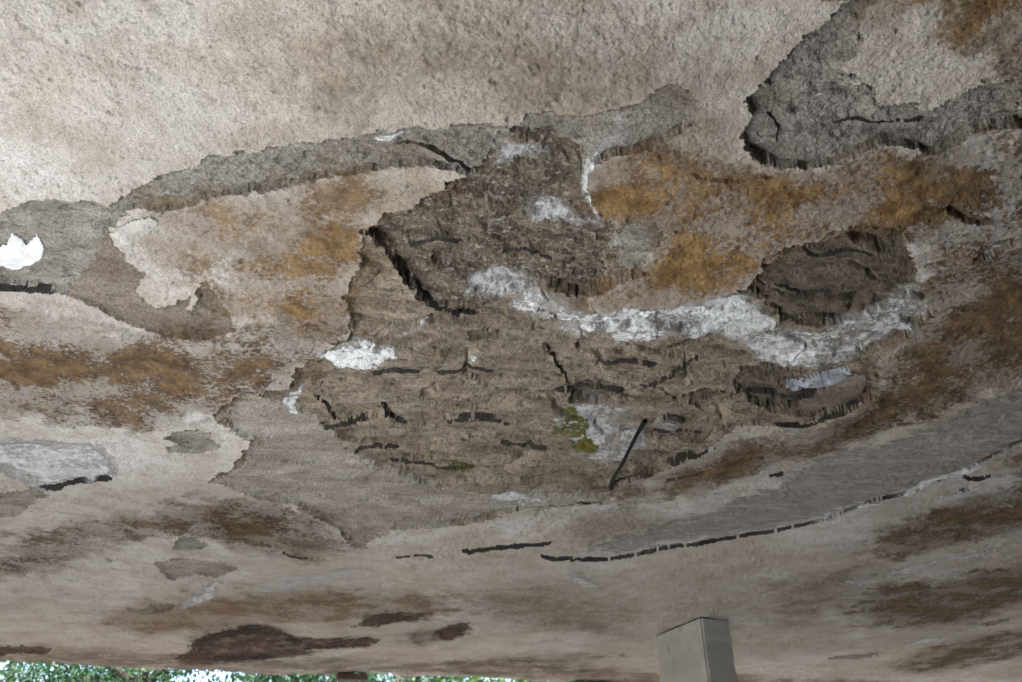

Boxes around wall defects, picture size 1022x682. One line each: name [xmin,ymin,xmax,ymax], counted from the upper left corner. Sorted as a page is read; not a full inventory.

spalling [738,0,1022,171]
water stain [895,0,1022,102]
crack [0,282,54,295]
spalling [0,83,945,550]
water stain [467,111,1022,506]
crack [396,552,433,560]
crack [461,439,1022,562]